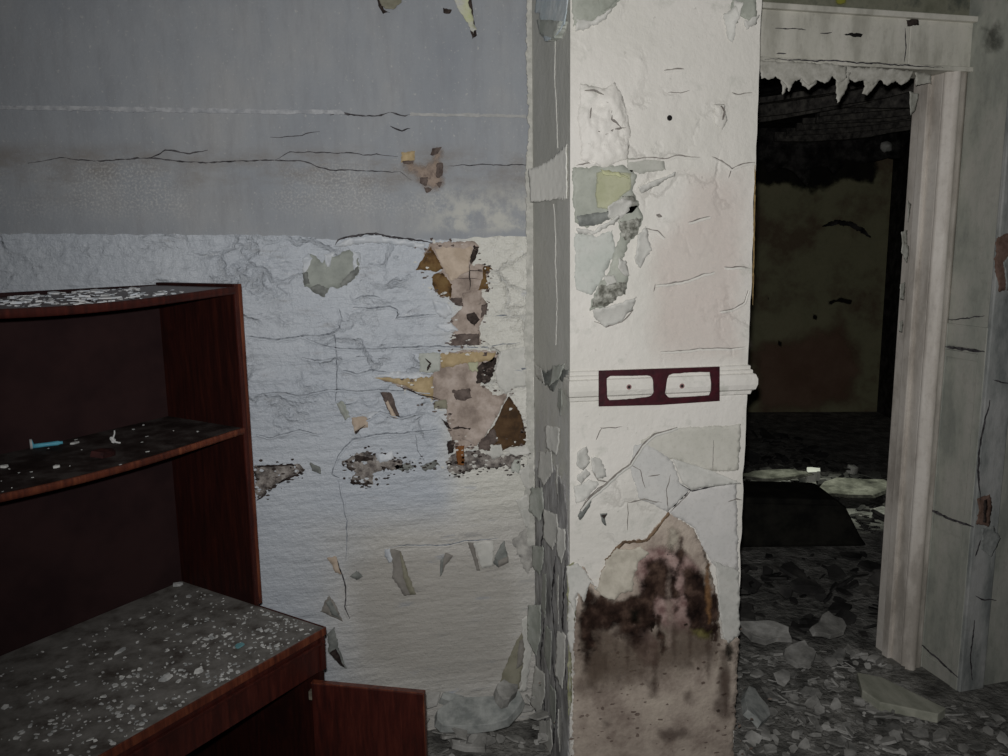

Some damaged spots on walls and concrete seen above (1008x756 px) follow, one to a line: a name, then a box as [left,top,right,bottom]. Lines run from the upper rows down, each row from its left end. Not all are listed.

peeling [760,19,932,115]
crack [30,112,411,180]
peeling [528,0,676,345]
peeling [302,250,361,297]
crack [335,232,432,250]
crack [945,345,985,353]
flaking render [254,459,321,510]
crack [246,295,531,619]
flaking render [336,238,754,756]
crack [977,380,1008,500]
peeling [320,596,347,669]
water stain [580,537,732,680]